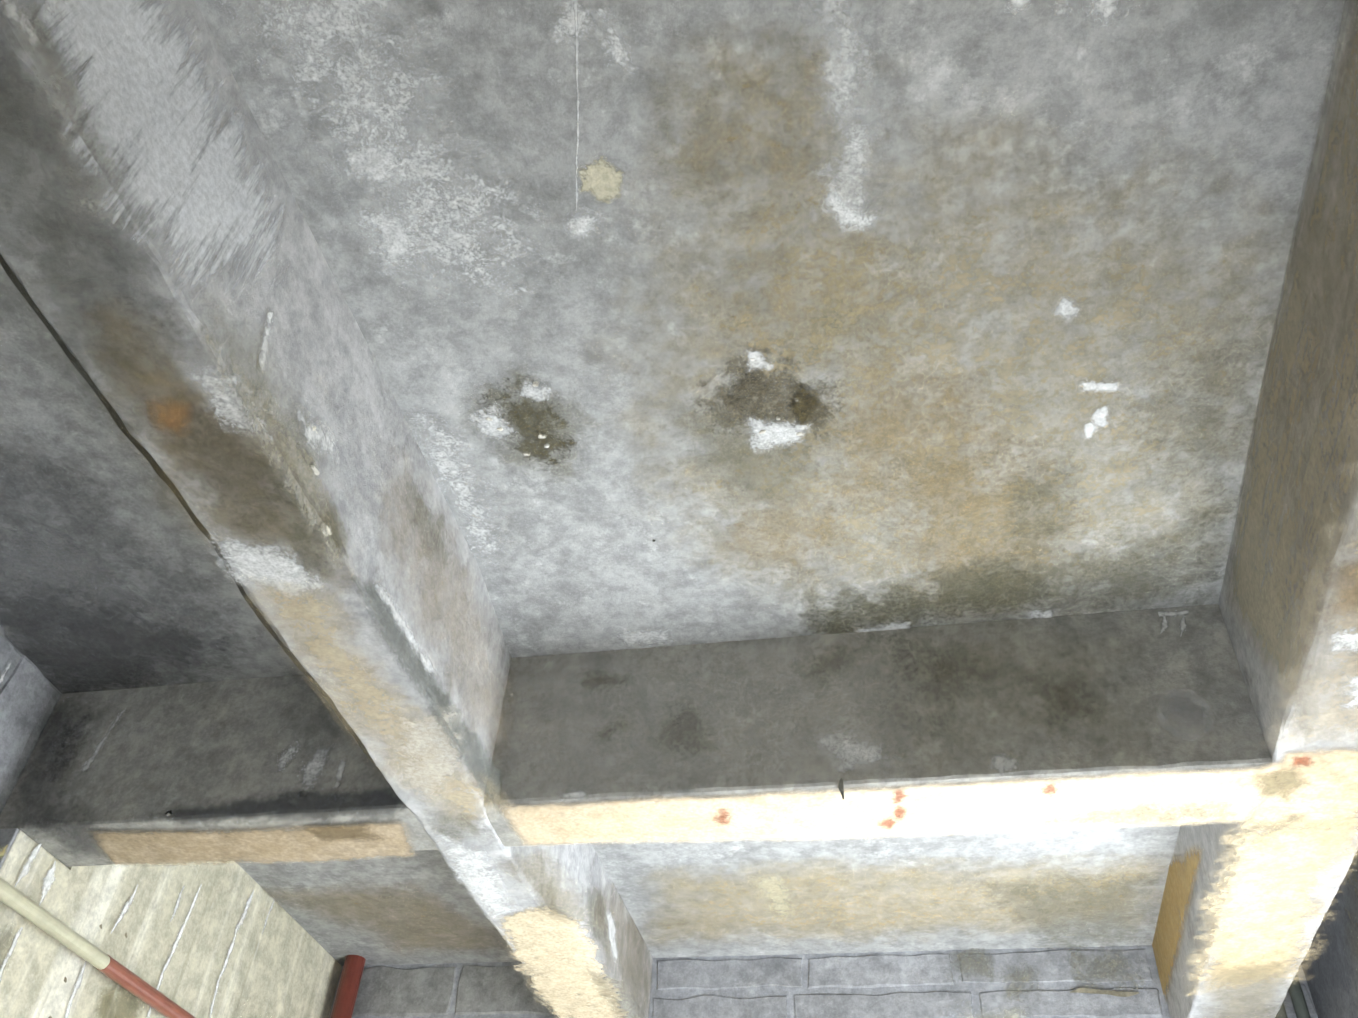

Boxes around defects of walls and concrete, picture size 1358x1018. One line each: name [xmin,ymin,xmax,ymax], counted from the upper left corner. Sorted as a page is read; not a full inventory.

leakage [33,0,281,286]
leakage [1054,299,1078,319]
spalling [471,378,577,465]
spalling [696,350,843,449]
leakage [1084,407,1109,438]
leakage [1083,382,1118,391]
crack [0,254,376,766]
leakage [0,449,222,693]
leakage [617,631,672,646]
leakage [830,557,1188,634]